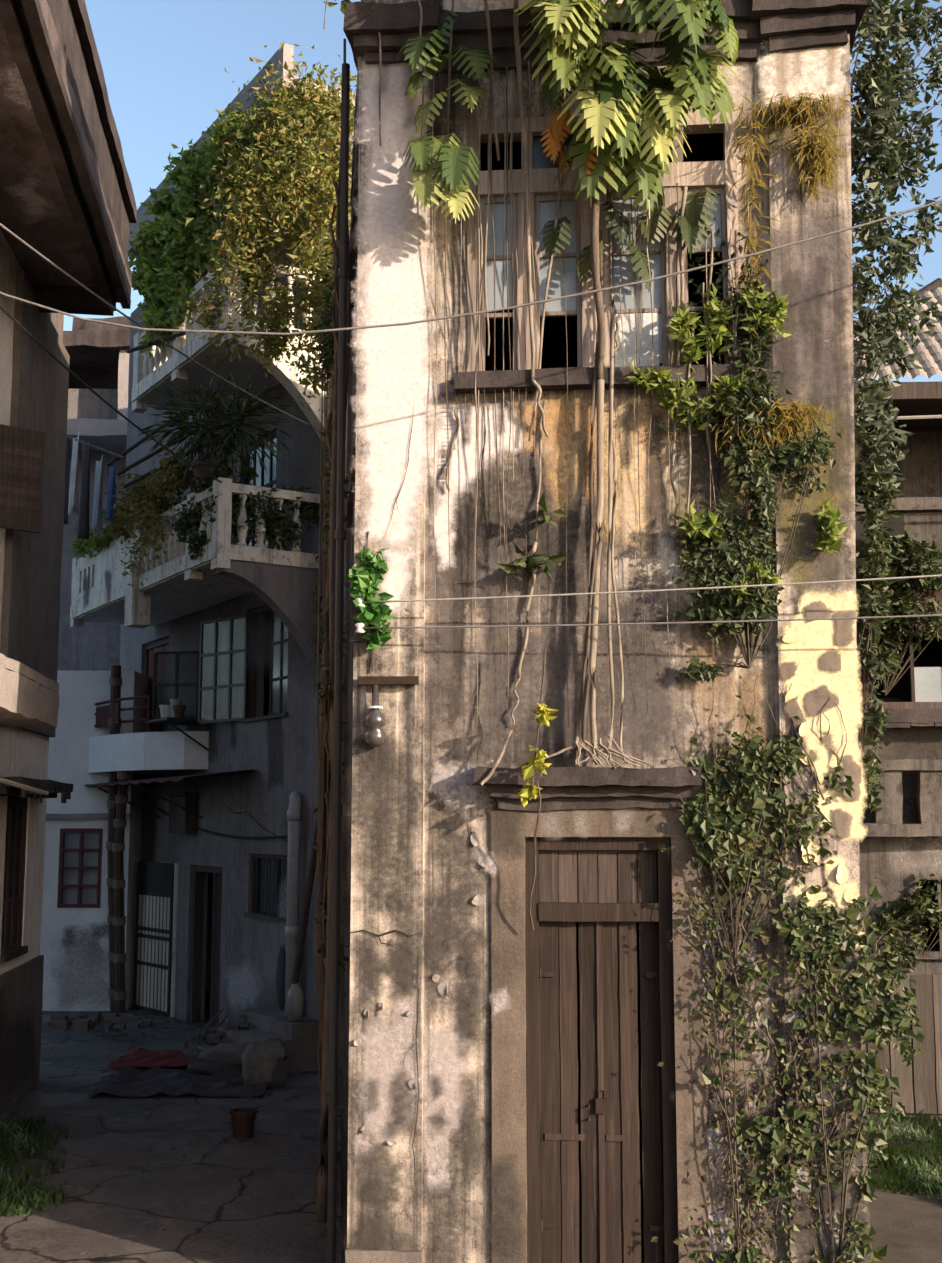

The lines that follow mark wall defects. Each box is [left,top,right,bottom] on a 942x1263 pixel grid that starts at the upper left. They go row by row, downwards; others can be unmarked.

water stain [445,399,471,444]
water stain [574,402,724,538]
water stain [429,442,667,752]
water stain [353,738,489,1049]
crack [348,930,419,1191]
water stain [355,1074,412,1251]
water stain [431,1192,459,1263]
water stain [461,1078,481,1176]